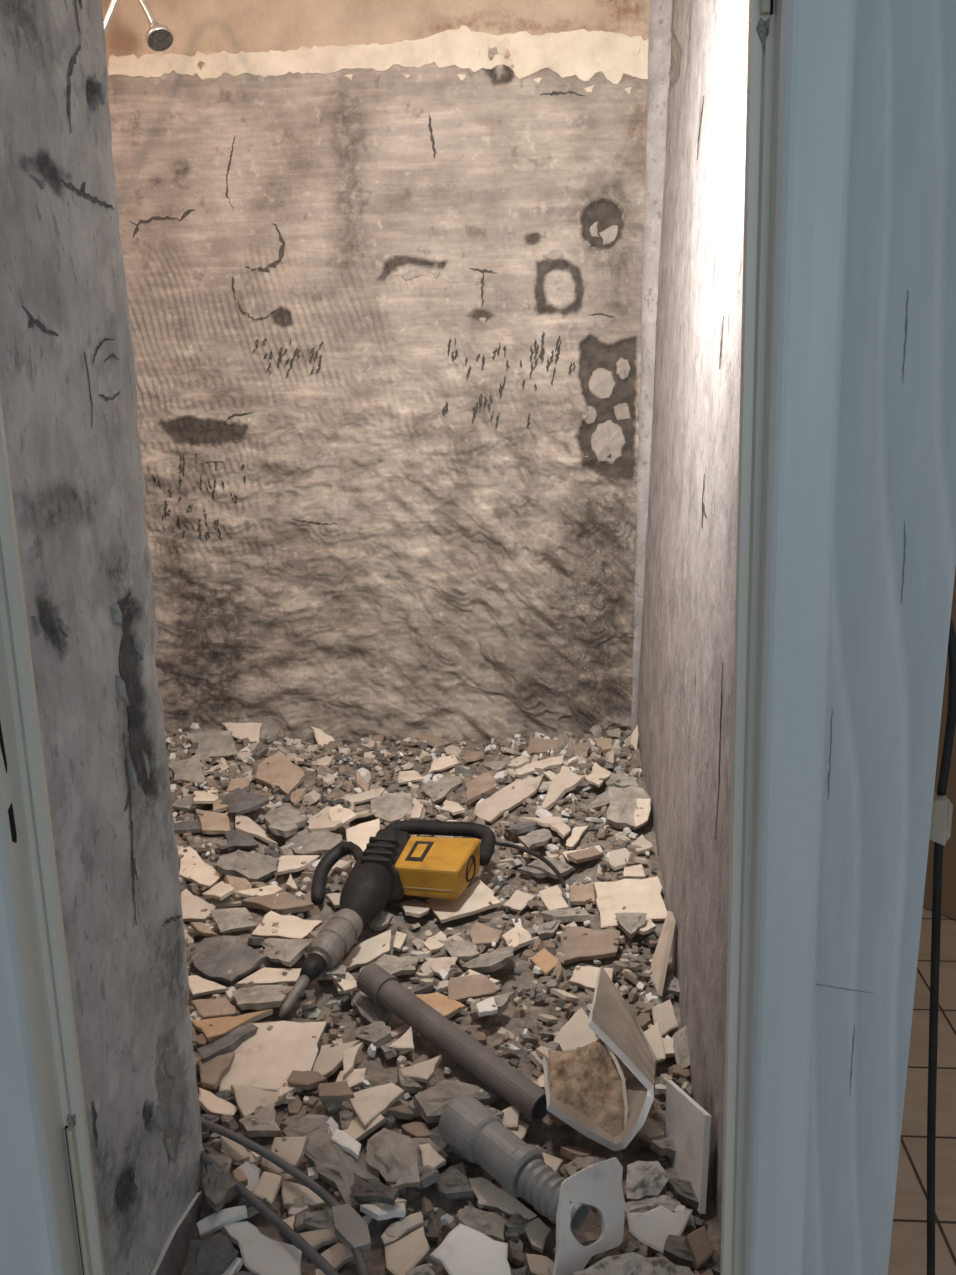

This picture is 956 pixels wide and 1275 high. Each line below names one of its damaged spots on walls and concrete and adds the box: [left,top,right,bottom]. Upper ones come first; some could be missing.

crack [68,0,82,133]
peeling [86,25,649,105]
crack [52,173,195,238]
crack [226,136,235,210]
crack [231,223,285,321]
crack [470,268,497,307]
spalling [526,230,584,314]
spalling [581,199,623,249]
spalling [447,331,637,481]
spalling [152,416,248,541]
water stain [173,580,253,724]
water stain [560,494,628,718]